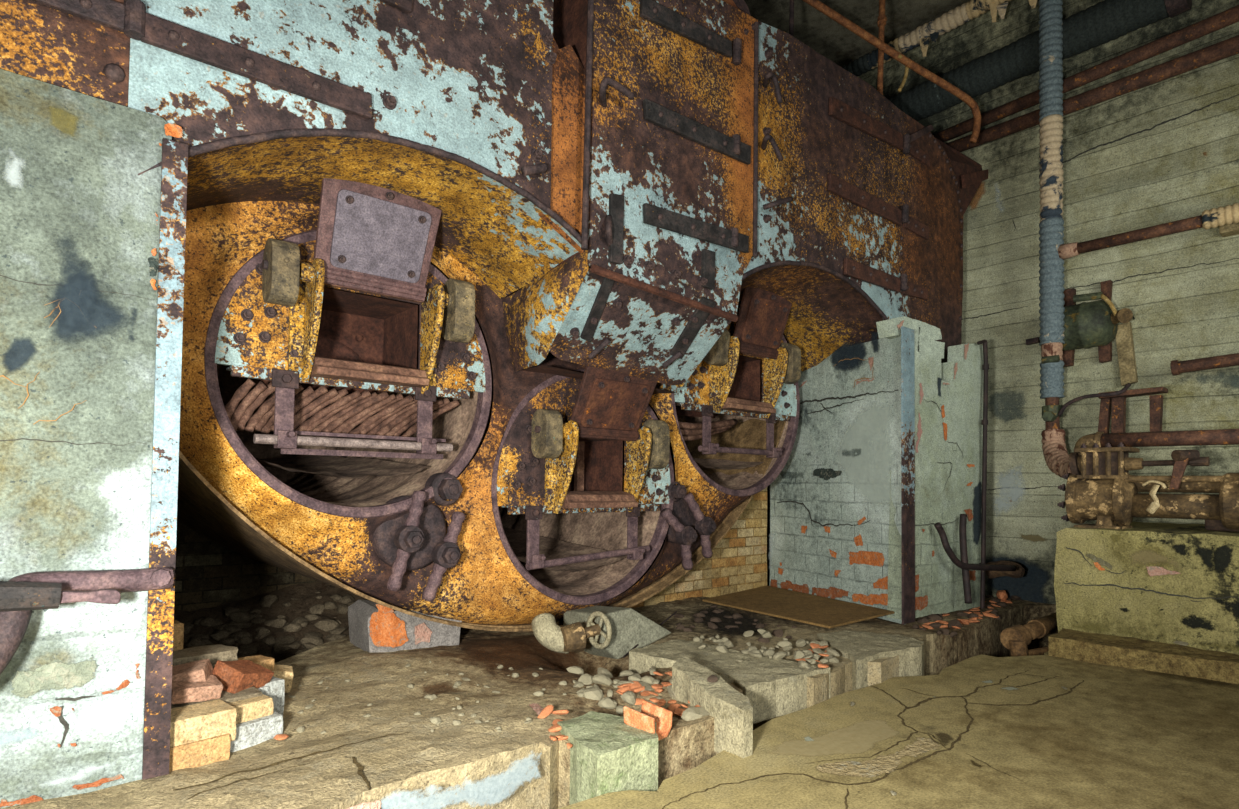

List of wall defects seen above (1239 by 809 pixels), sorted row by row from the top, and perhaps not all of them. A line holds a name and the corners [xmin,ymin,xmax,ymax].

leakage [53,241,136,340]
leakage [3,339,37,372]
crack [777,501,870,527]
spalling [770,516,888,605]
crack [1064,547,1237,602]
leakage [1160,540,1233,573]
leakage [1182,615,1215,630]
leakage [1217,599,1239,621]
crack [662,670,1084,809]